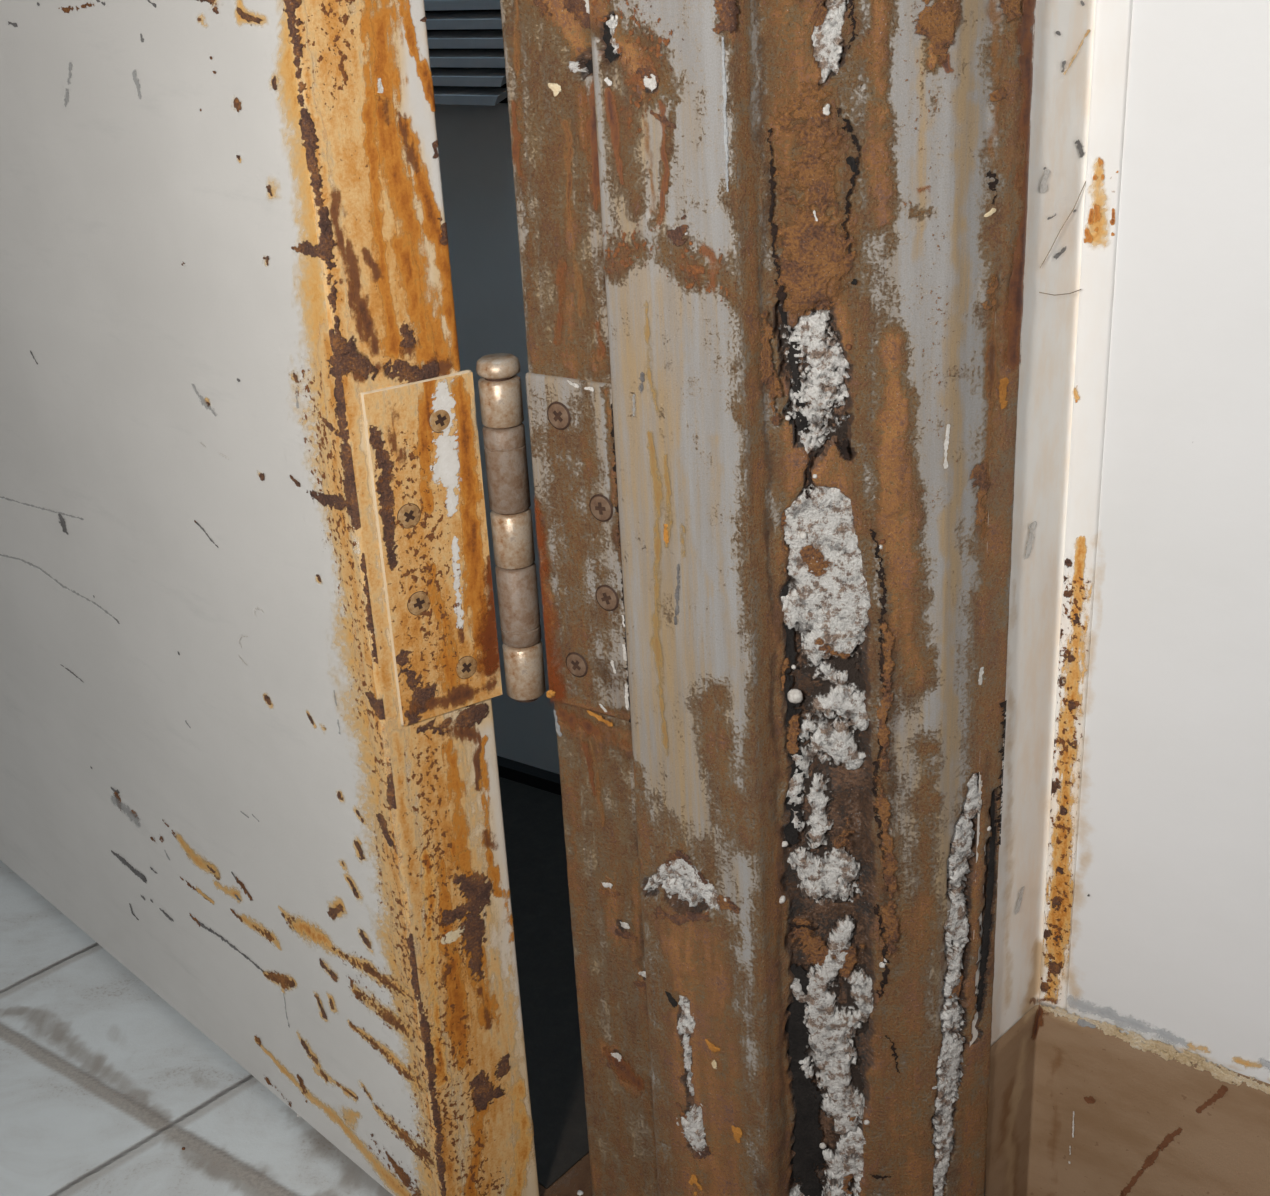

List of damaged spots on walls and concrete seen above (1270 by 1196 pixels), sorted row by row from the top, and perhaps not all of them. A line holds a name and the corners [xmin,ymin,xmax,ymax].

corrosion [196,0,219,25]
corrosion [533,0,740,358]
corrosion [758,82,861,426]
corrosion [914,0,959,73]
corrosion [969,0,1036,539]
corrosion [1084,158,1118,246]
corrosion [235,0,592,1196]
corrosion [535,507,629,827]
corrosion [1030,536,1092,1040]
corrosion [603,1047,644,1091]
peeling [1039,1003,1270,1094]